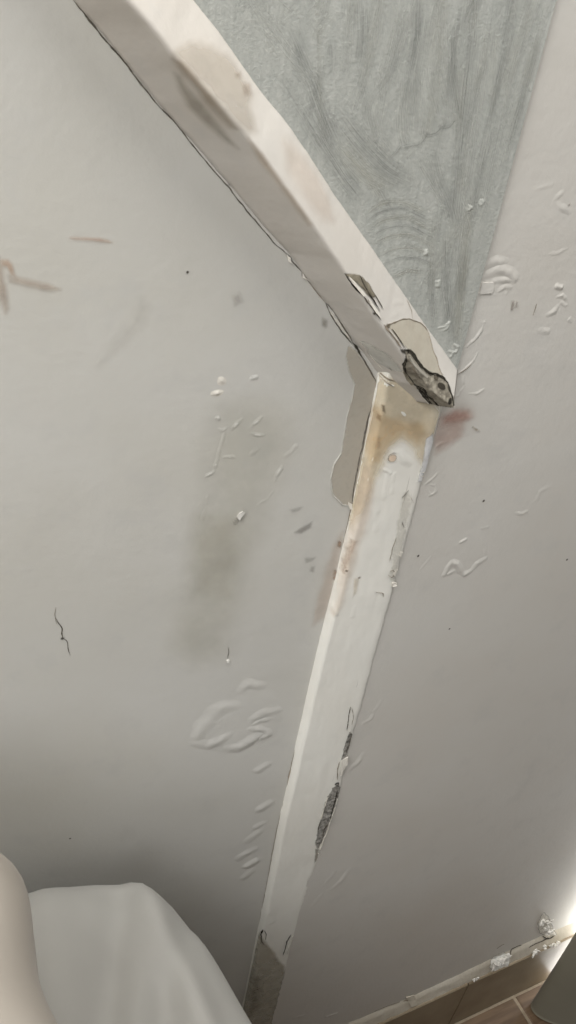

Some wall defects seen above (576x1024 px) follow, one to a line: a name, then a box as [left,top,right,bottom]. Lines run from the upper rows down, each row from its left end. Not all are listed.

peeling [345,274,455,408]
spalling [315,707,354,861]
spalling [490,952,512,971]
spalling [532,913,561,958]